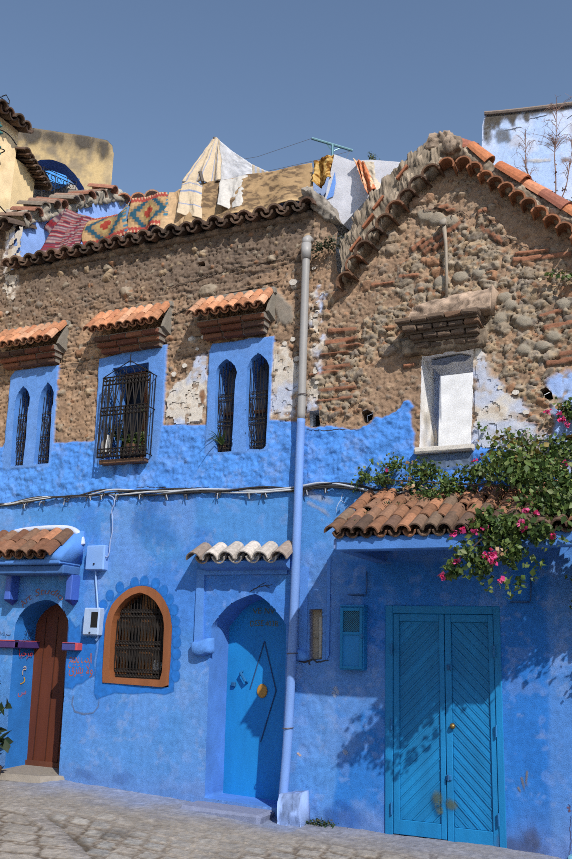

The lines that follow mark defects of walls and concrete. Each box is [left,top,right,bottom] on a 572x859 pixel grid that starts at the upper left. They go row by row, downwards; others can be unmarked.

water stain [484,107,564,135]
peeling [311,291,325,346]
peeling [165,335,207,424]
peeling [272,337,319,414]
peeling [419,348,560,469]